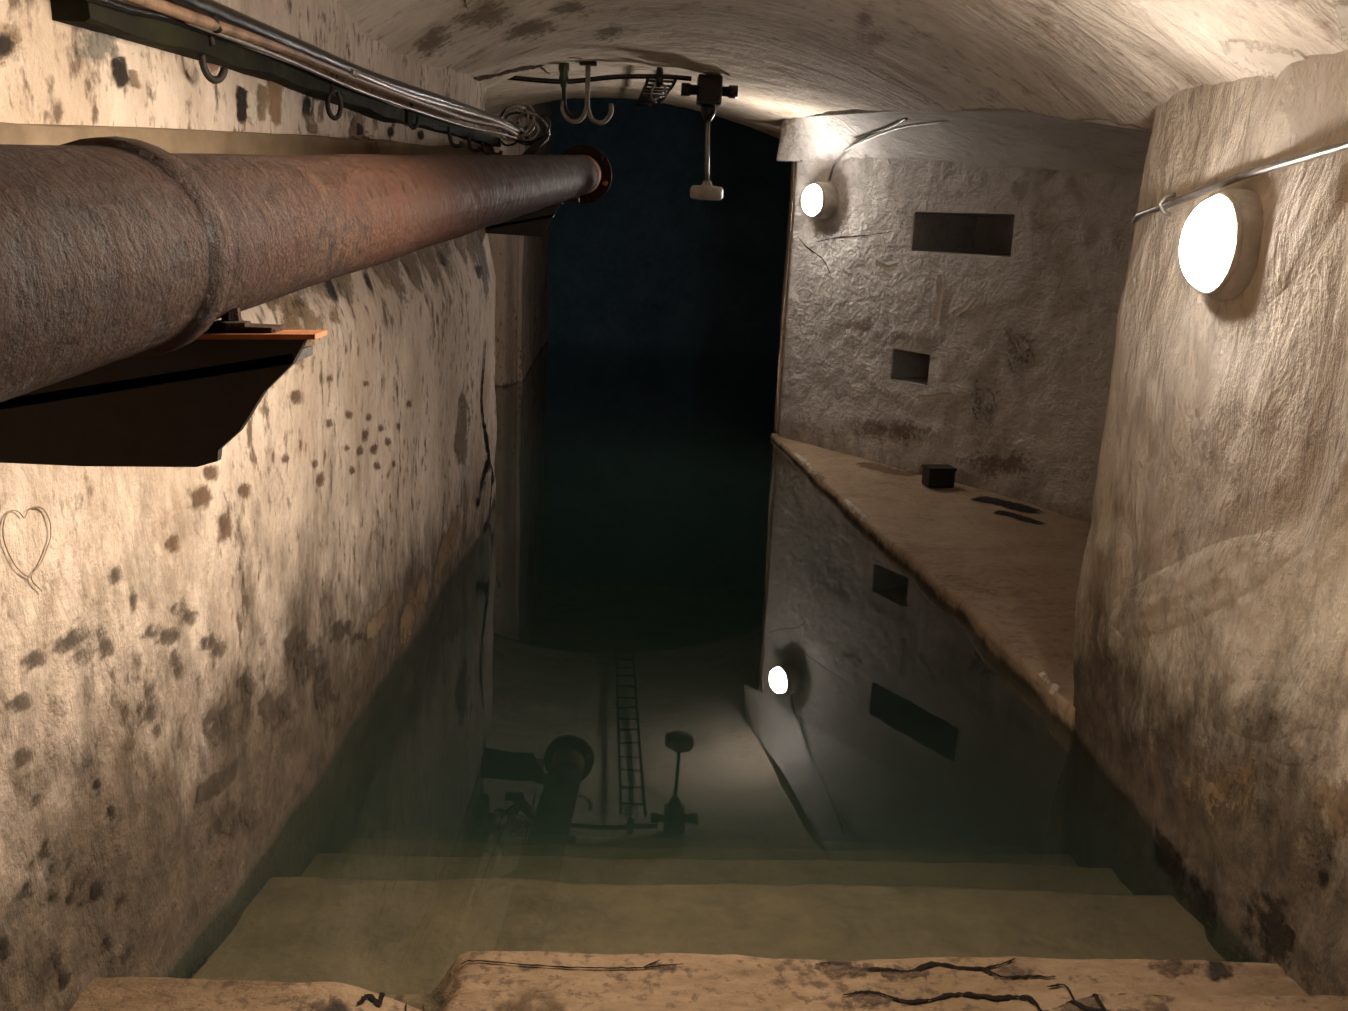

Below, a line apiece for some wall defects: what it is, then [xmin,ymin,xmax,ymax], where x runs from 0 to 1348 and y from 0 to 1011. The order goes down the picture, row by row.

crack [475,341,495,530]
water stain [24,617,115,669]
water stain [142,600,198,677]
water stain [201,633,226,656]
water stain [8,692,32,709]
water stain [140,679,161,733]
water stain [17,747,35,766]
water stain [197,757,240,806]
water stain [21,838,104,904]
water stain [1154,829,1217,938]
water stain [1240,893,1293,970]
crack [815,958,1132,1011]